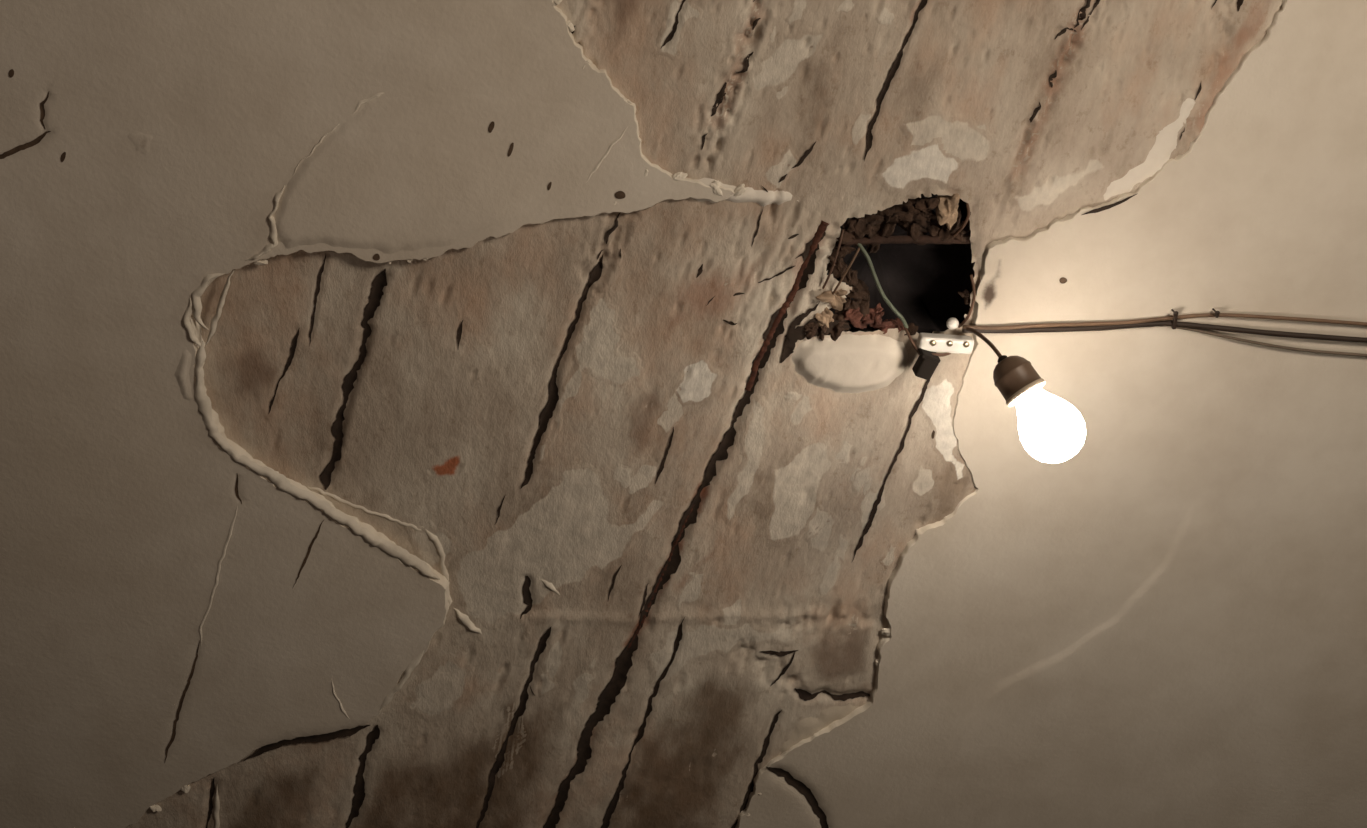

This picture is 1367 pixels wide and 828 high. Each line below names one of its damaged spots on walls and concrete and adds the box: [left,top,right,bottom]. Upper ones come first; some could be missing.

spalling [862,137,963,194]
spalling [898,108,998,168]
crack [293,269,387,587]
corrosion [419,453,464,482]
crack [495,212,621,524]
spalling [451,463,674,635]
spalling [533,292,645,465]
crack [543,142,826,828]
spalling [556,220,979,828]
corrosion [649,214,971,375]
crack [853,380,930,560]
crack [731,650,870,828]